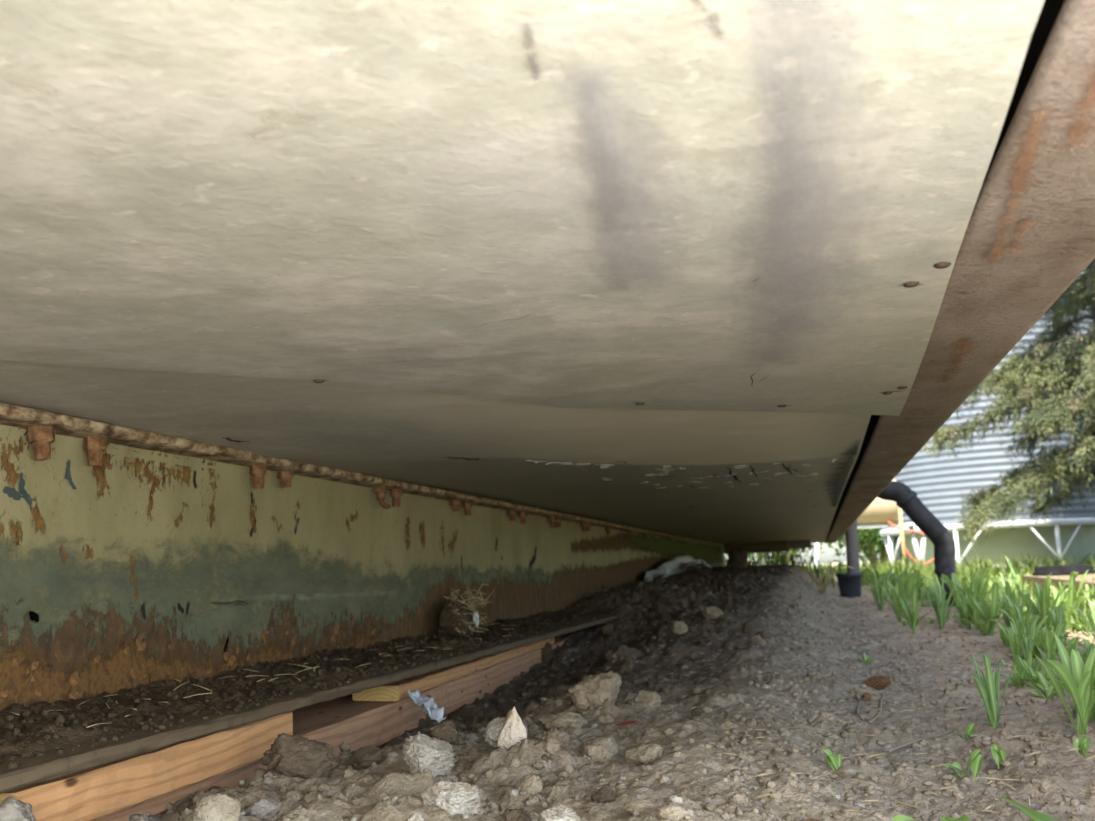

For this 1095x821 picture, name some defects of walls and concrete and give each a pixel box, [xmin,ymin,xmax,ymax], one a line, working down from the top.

corrosion [0,424,32,488]
peeling [3,472,34,506]
corrosion [0,497,45,545]
peeling [65,460,77,489]
corrosion [93,442,191,521]
corrosion [208,460,217,528]
corrosion [0,533,697,711]